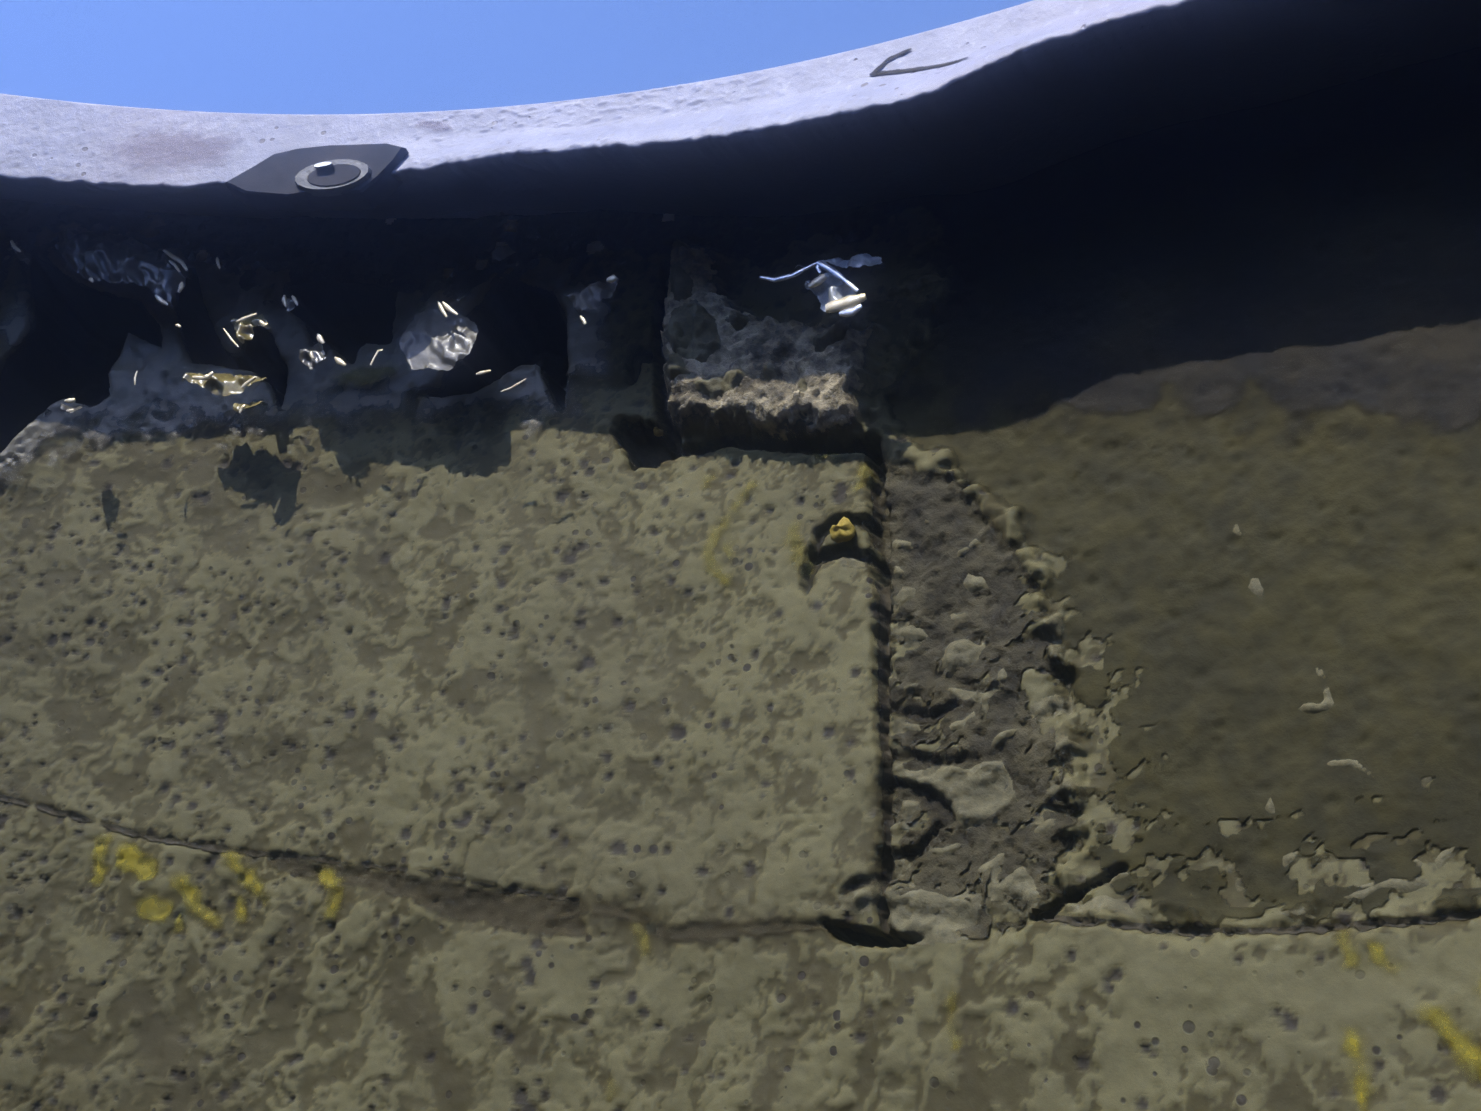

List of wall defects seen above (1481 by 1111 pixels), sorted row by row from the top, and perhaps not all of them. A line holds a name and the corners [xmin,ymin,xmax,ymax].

spalling [616,239,874,471]
crack [0,262,979,948]
crack [1036,868,1481,937]